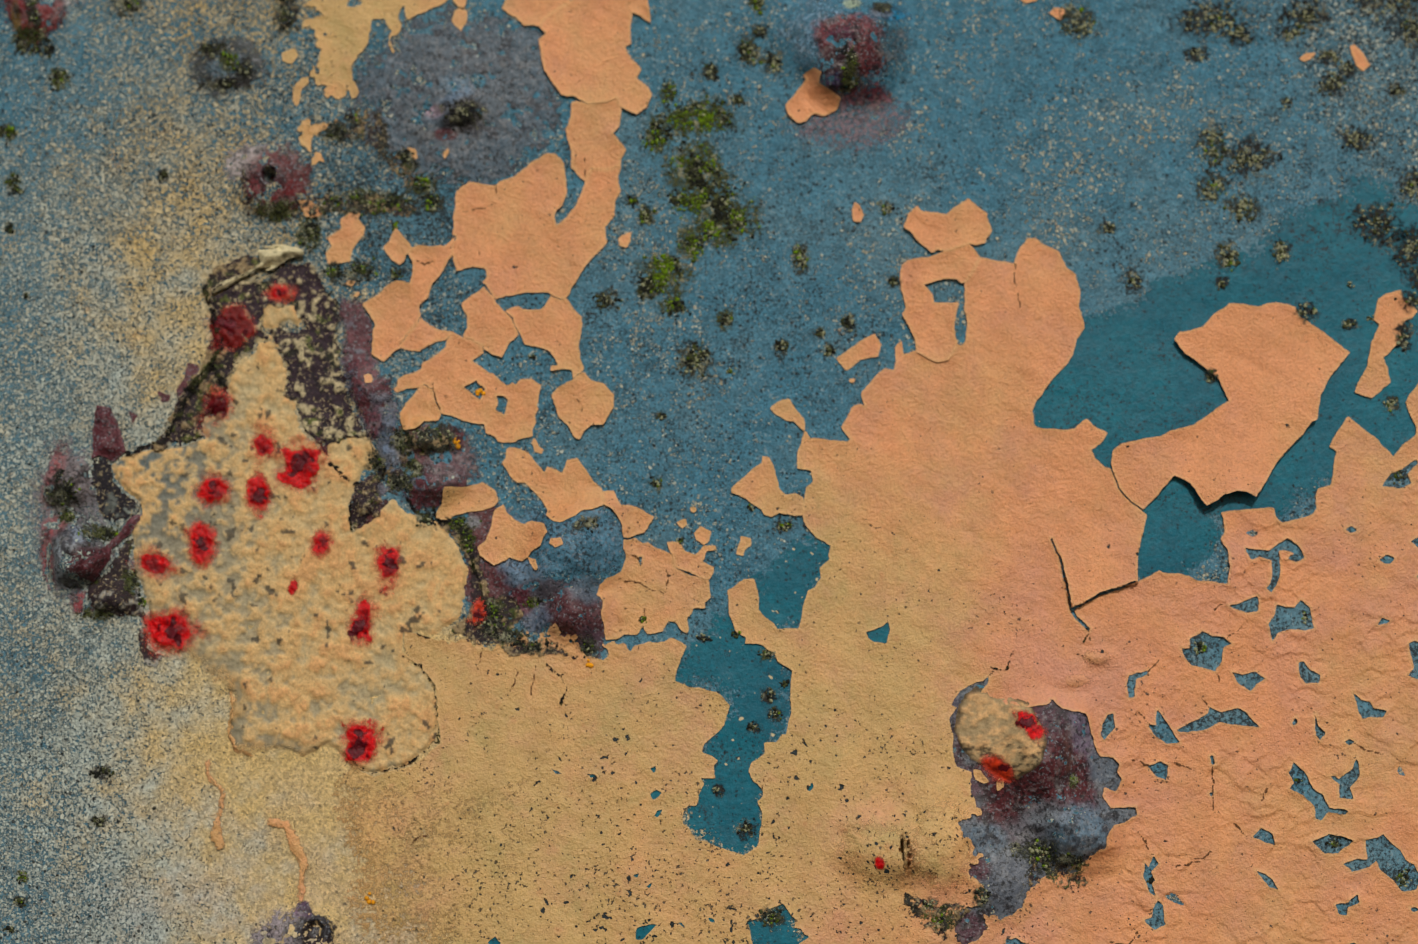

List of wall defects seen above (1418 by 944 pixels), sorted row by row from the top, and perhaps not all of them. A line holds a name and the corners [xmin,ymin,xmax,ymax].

peeling [282,48,298,64]
peeling [293,0,468,165]
mould [1168,0,1256,63]
mould [1273,0,1332,42]
mould [1315,49,1359,98]
mould [1344,0,1418,51]
mould [1219,135,1283,186]
peeling [363,0,652,454]
mould [1269,238,1292,269]
damp [1347,165,1418,357]
peeling [91,174,1418,944]
crack [1051,541,1094,664]